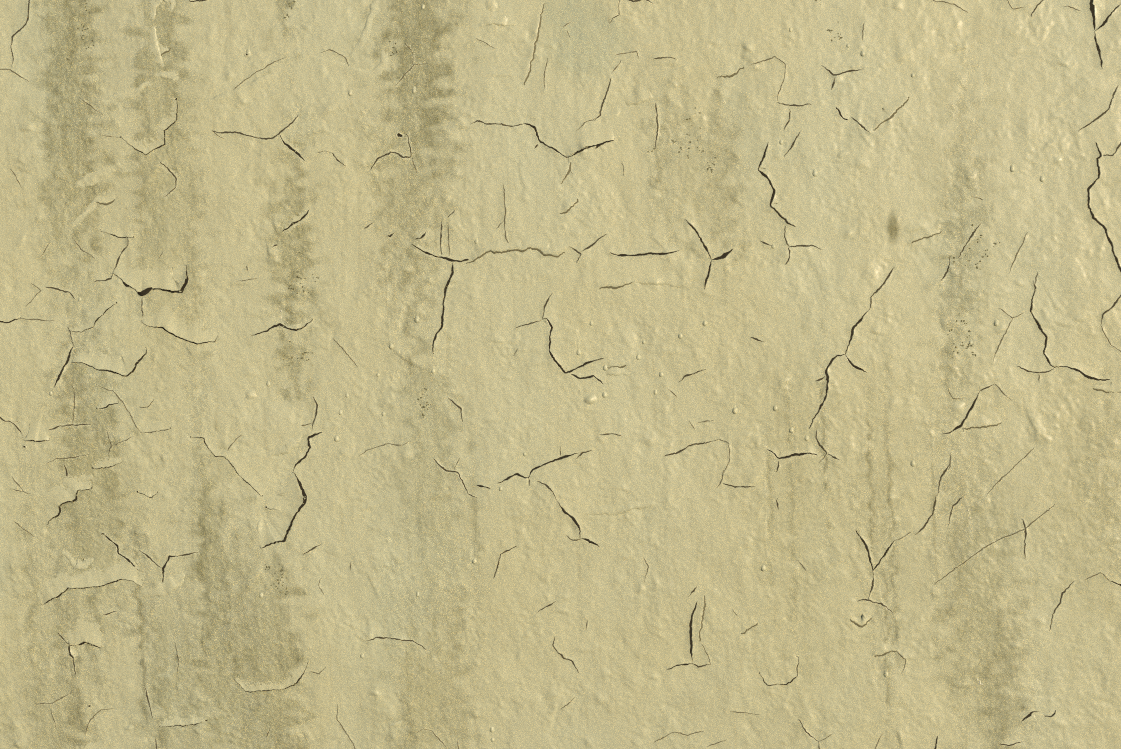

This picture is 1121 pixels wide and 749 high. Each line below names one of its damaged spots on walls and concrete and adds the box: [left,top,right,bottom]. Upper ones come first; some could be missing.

crack [470,49,678,176]
peeling [562,120,615,157]
crack [568,22,869,292]
peeling [71,345,147,377]
peeling [92,223,218,345]
crack [362,209,474,356]
crack [513,290,606,387]
crack [851,0,1121,615]
peeling [190,396,325,548]
crack [432,430,624,552]
peeling [35,560,147,605]
peeling [234,661,327,693]